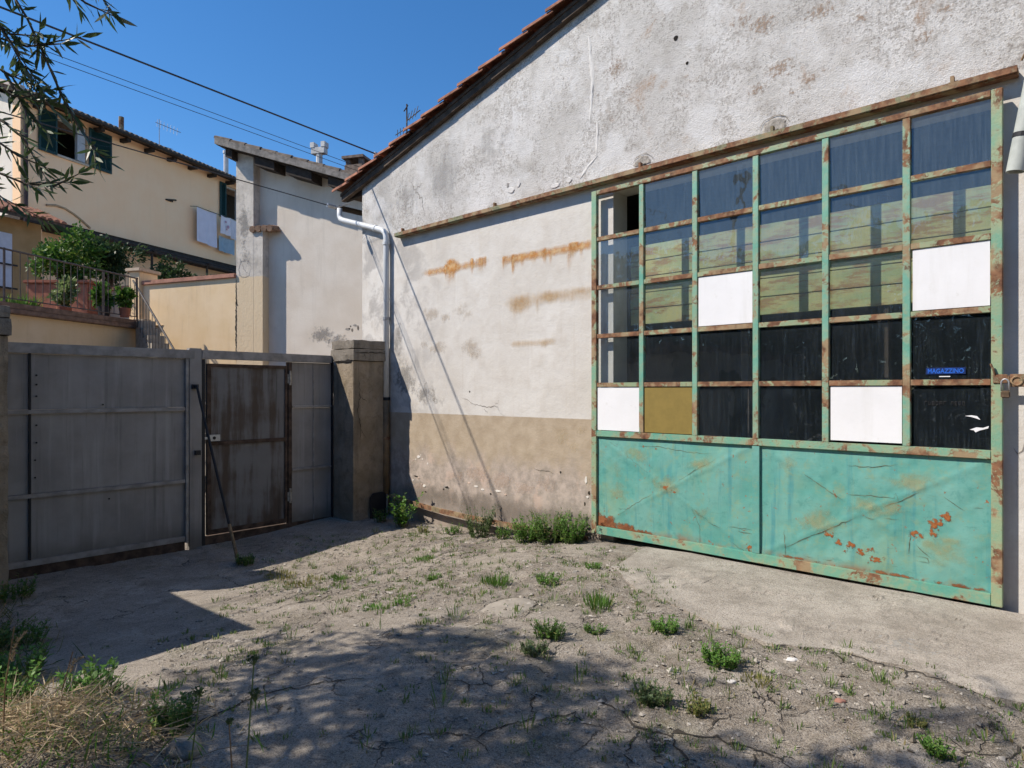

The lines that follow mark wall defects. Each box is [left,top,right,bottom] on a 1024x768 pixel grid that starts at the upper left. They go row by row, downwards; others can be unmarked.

corrosion [428,257,486,274]
corrosion [503,242,590,266]
corrosion [598,512,651,534]
corrosion [911,512,951,539]
corrosion [823,531,923,581]